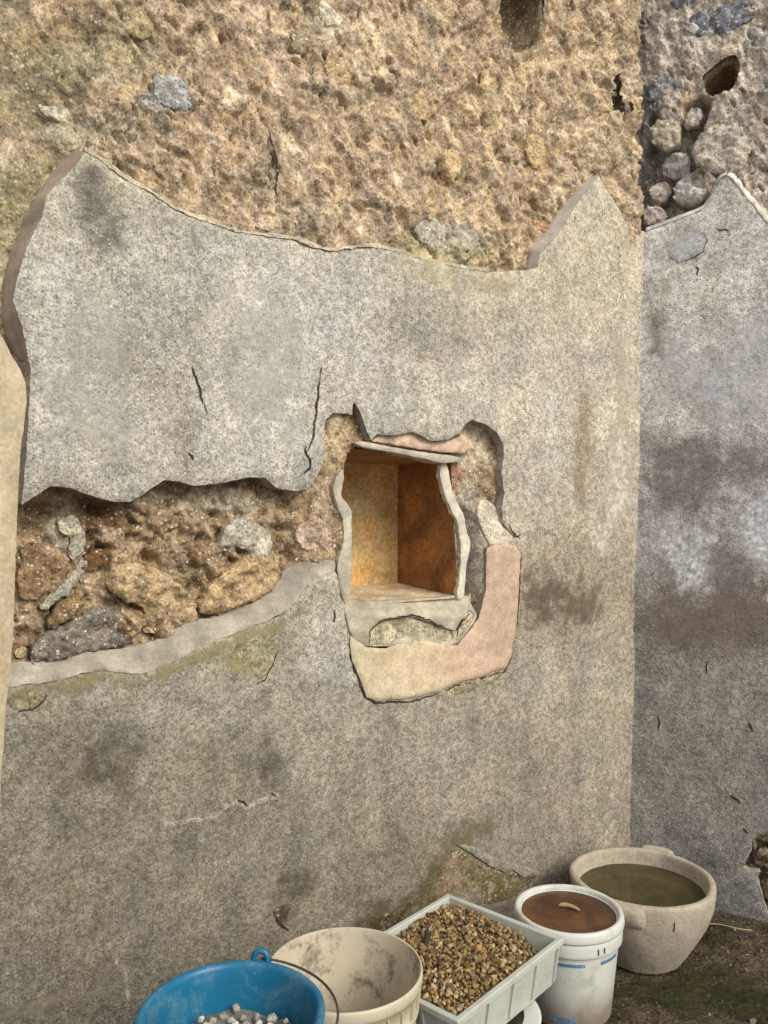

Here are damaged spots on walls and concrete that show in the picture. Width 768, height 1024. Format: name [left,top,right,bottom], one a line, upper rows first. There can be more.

crack [268,130,279,203]
spalling [0,0,768,373]
crack [192,366,208,414]
crack [304,367,322,474]
spalling [8,413,599,712]
damp [652,495,768,646]
spalling [745,834,768,909]